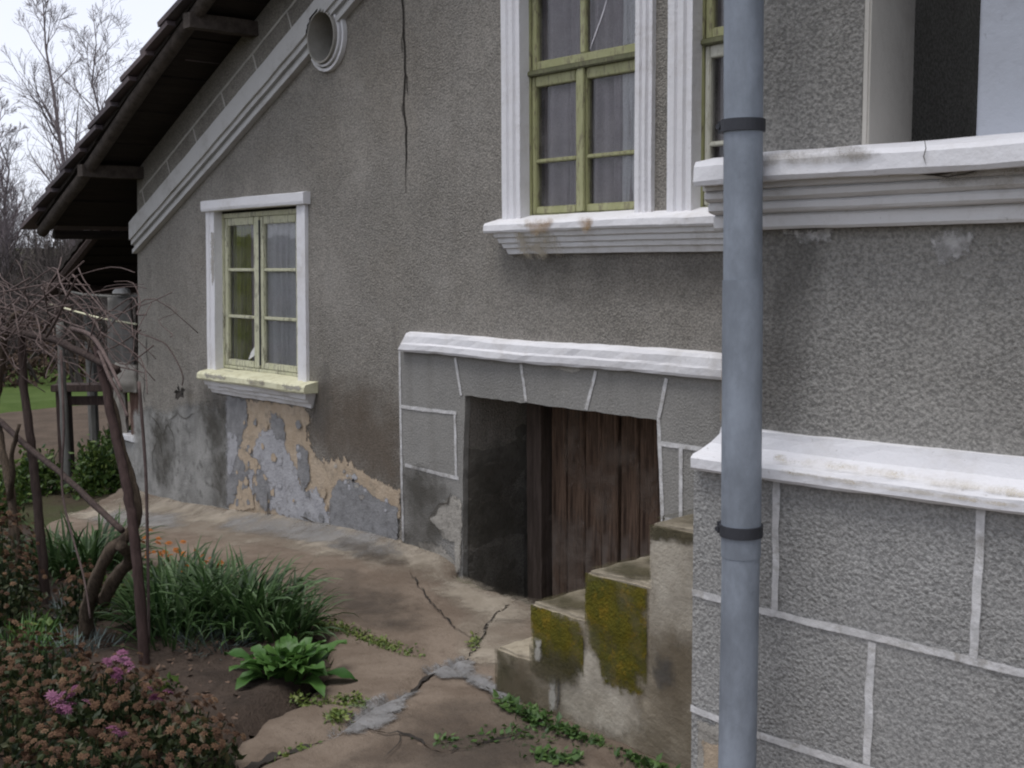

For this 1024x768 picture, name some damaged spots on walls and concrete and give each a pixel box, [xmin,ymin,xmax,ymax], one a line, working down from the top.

crack [400,0,408,193]
damp [68,506,127,525]
flaking render [225,395,401,525]
damp [133,403,531,663]
spalling [417,492,462,577]
crack [372,572,532,756]
damp [519,640,541,680]
crack [244,740,325,768]